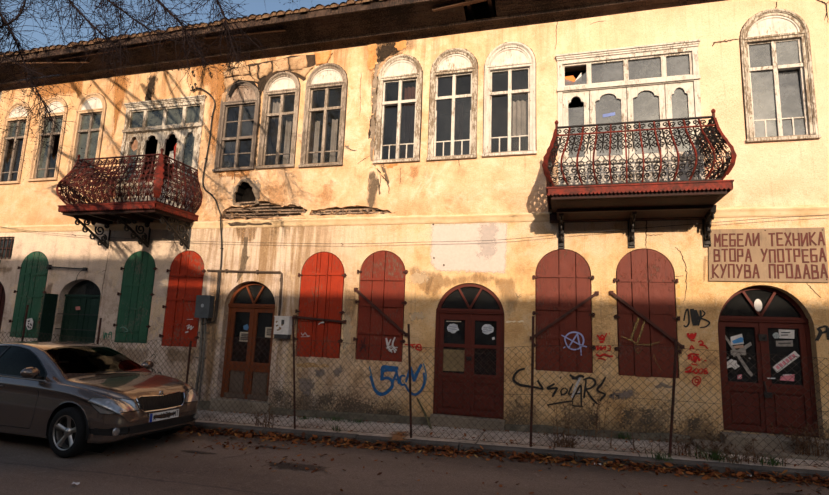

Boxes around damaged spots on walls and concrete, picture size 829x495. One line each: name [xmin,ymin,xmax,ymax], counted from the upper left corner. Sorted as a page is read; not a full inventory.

flaking render [367,44,398,175]
flaking render [219,172,261,206]
crack [645,221,687,302]